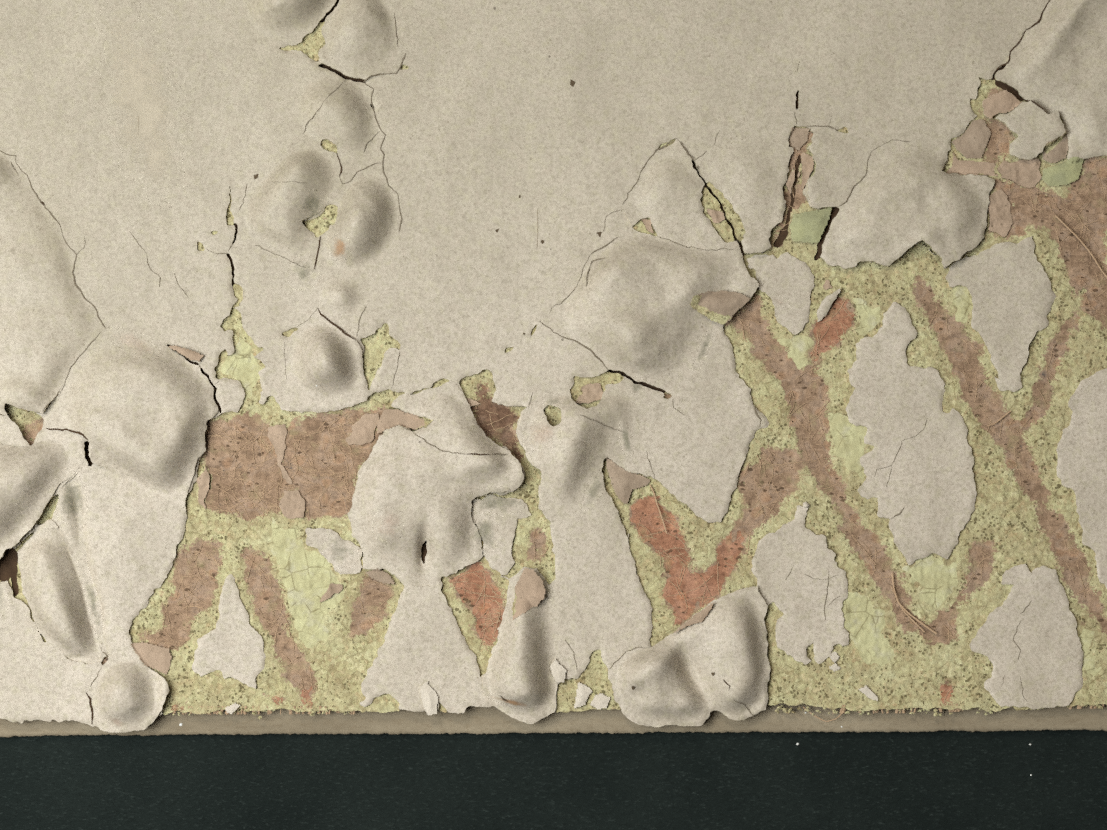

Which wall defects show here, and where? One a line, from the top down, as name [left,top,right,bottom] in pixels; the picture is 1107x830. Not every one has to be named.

peeling [280,22,325,62]
crack [303,13,406,230]
crack [0,150,105,466]
crack [208,185,321,286]
crack [541,132,746,415]
crack [814,140,910,260]
crack [167,344,221,413]
peeling [543,405,561,426]
peeling [570,372,624,409]
peeling [601,78,1107,712]
peeling [129,284,556,715]
peeling [550,649,621,713]